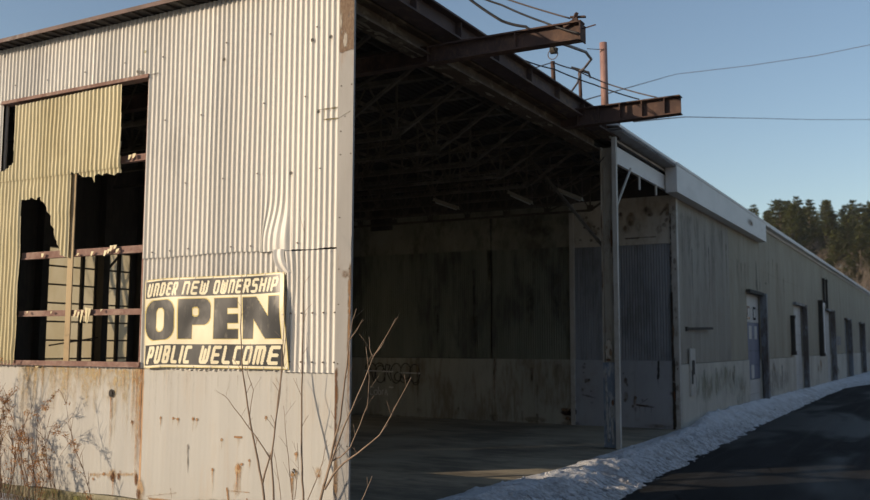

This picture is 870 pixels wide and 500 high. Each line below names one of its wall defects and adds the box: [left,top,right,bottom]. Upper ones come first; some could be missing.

corrosion [21,365,142,449]
corrosion [92,471,164,500]